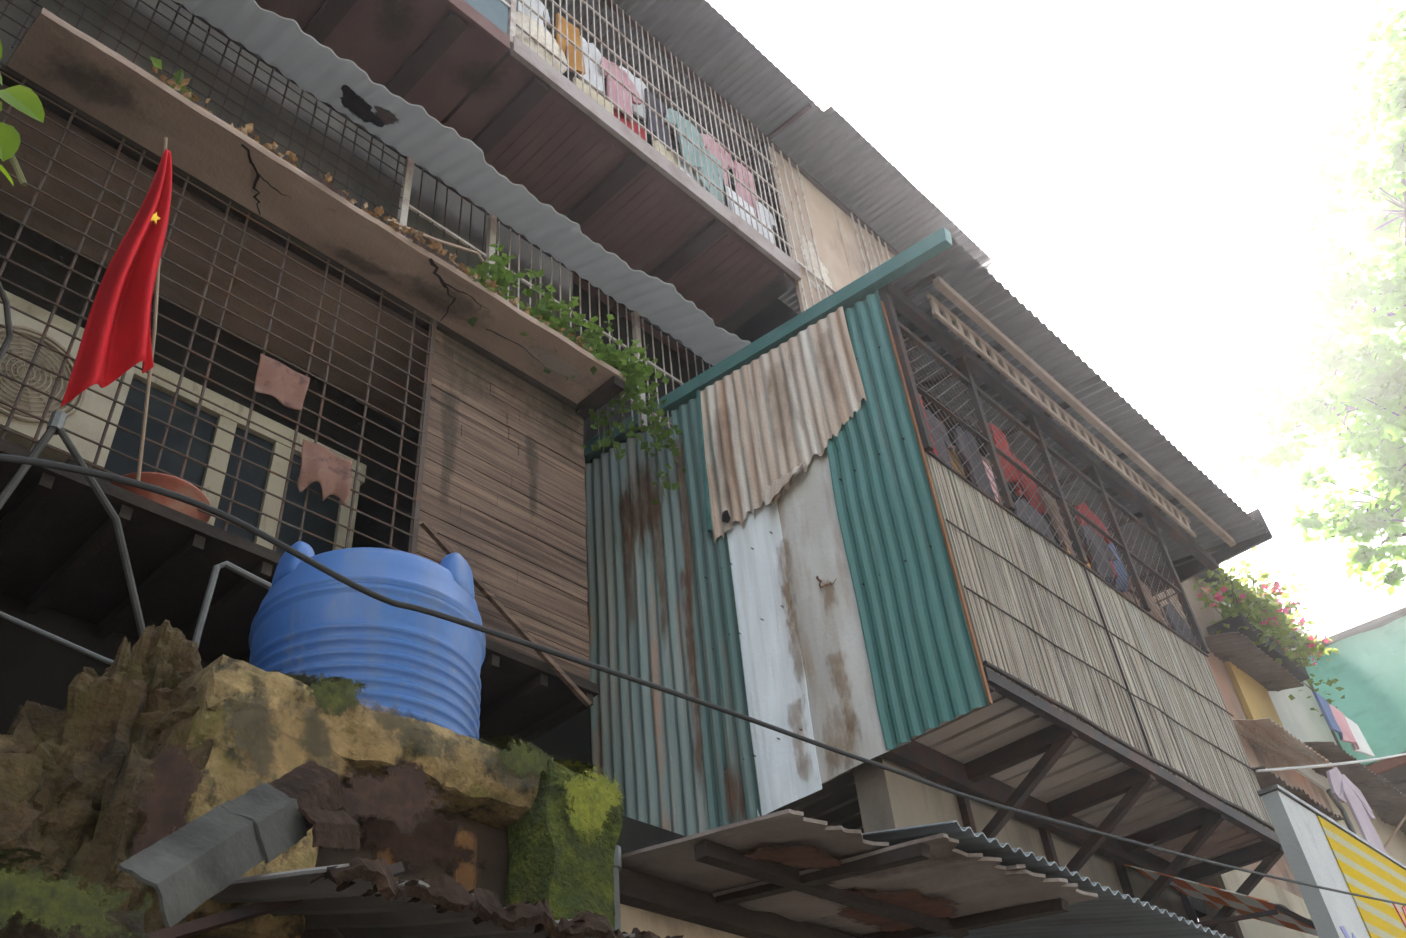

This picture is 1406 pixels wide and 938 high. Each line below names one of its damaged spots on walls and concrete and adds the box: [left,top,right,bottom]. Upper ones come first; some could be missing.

crack [241,144,291,215]
crack [429,258,579,383]
rust [620,440,702,769]
rust [780,543,802,671]
rust [816,576,836,608]
rust [826,653,855,766]
rust [454,829,475,891]
rust [824,882,959,934]